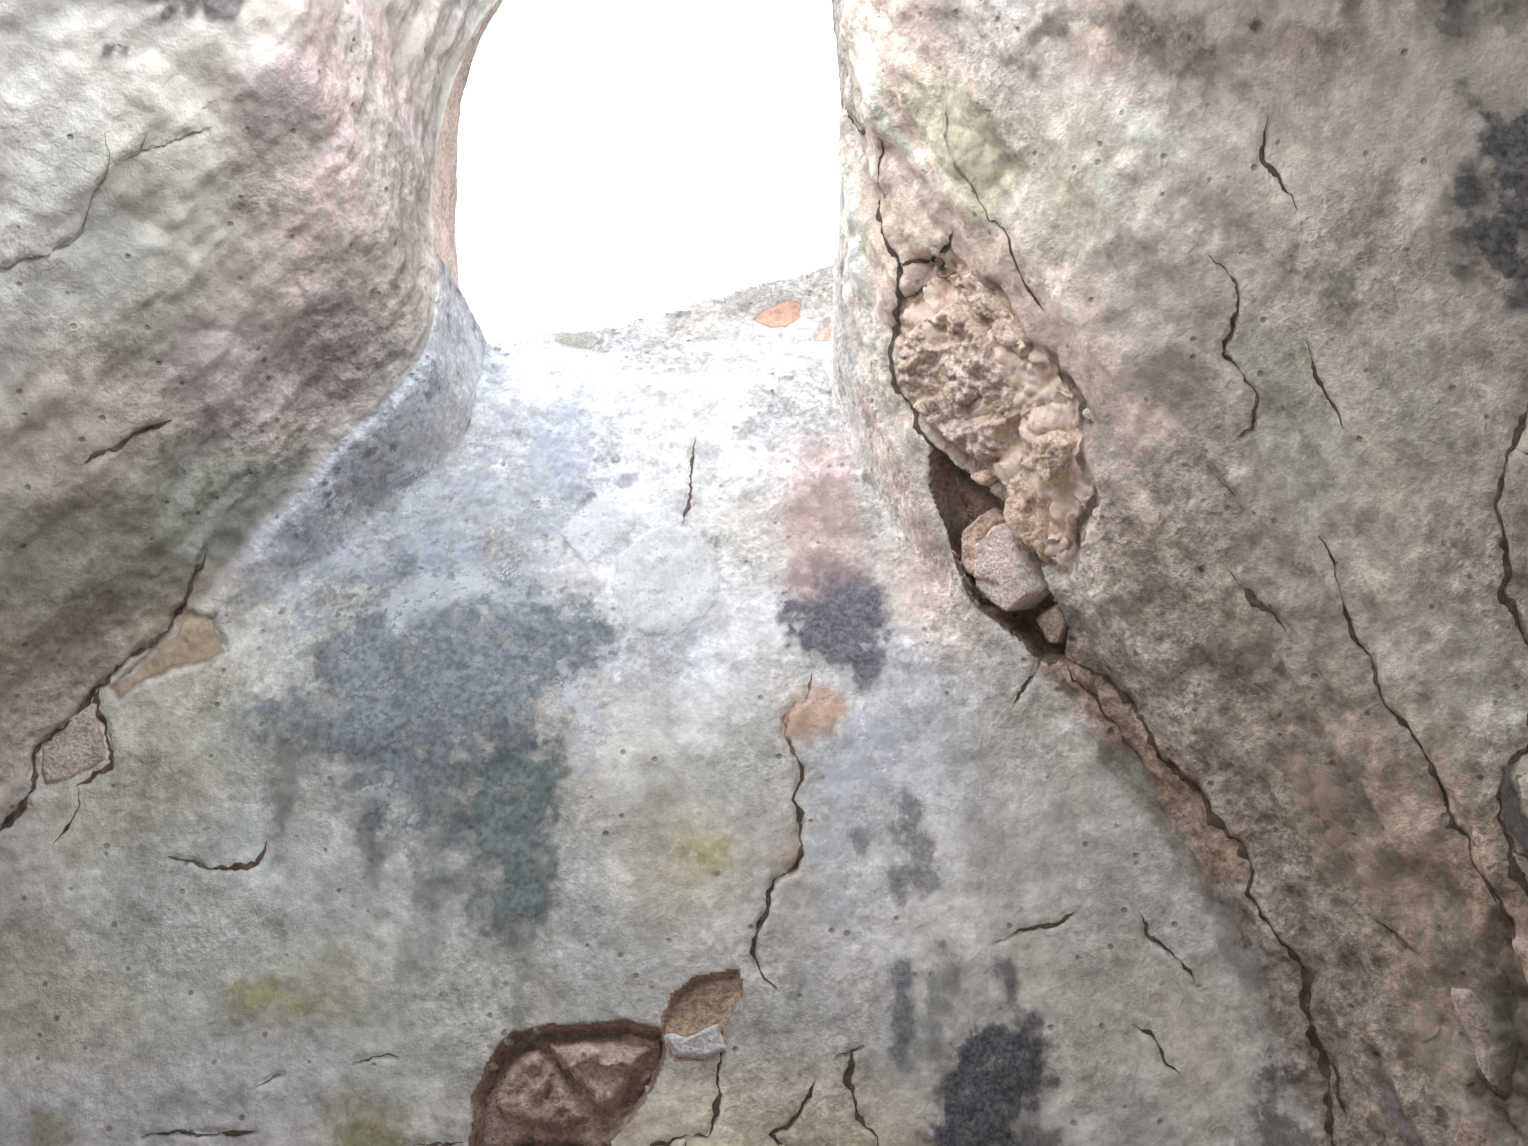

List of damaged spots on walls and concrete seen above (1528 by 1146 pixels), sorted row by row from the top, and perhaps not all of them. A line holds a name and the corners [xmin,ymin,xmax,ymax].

mould [1453,111,1528,309]
crack [0,549,208,844]
spalling [115,613,224,699]
water stain [243,397,618,933]
crack [750,673,812,988]
water stain [779,475,891,690]
spalling [898,247,1099,663]
crack [994,611,1347,1146]
crack [1318,536,1528,939]
crack [1493,403,1528,646]
spalling [469,969,743,1146]
water stain [891,960,1062,1146]